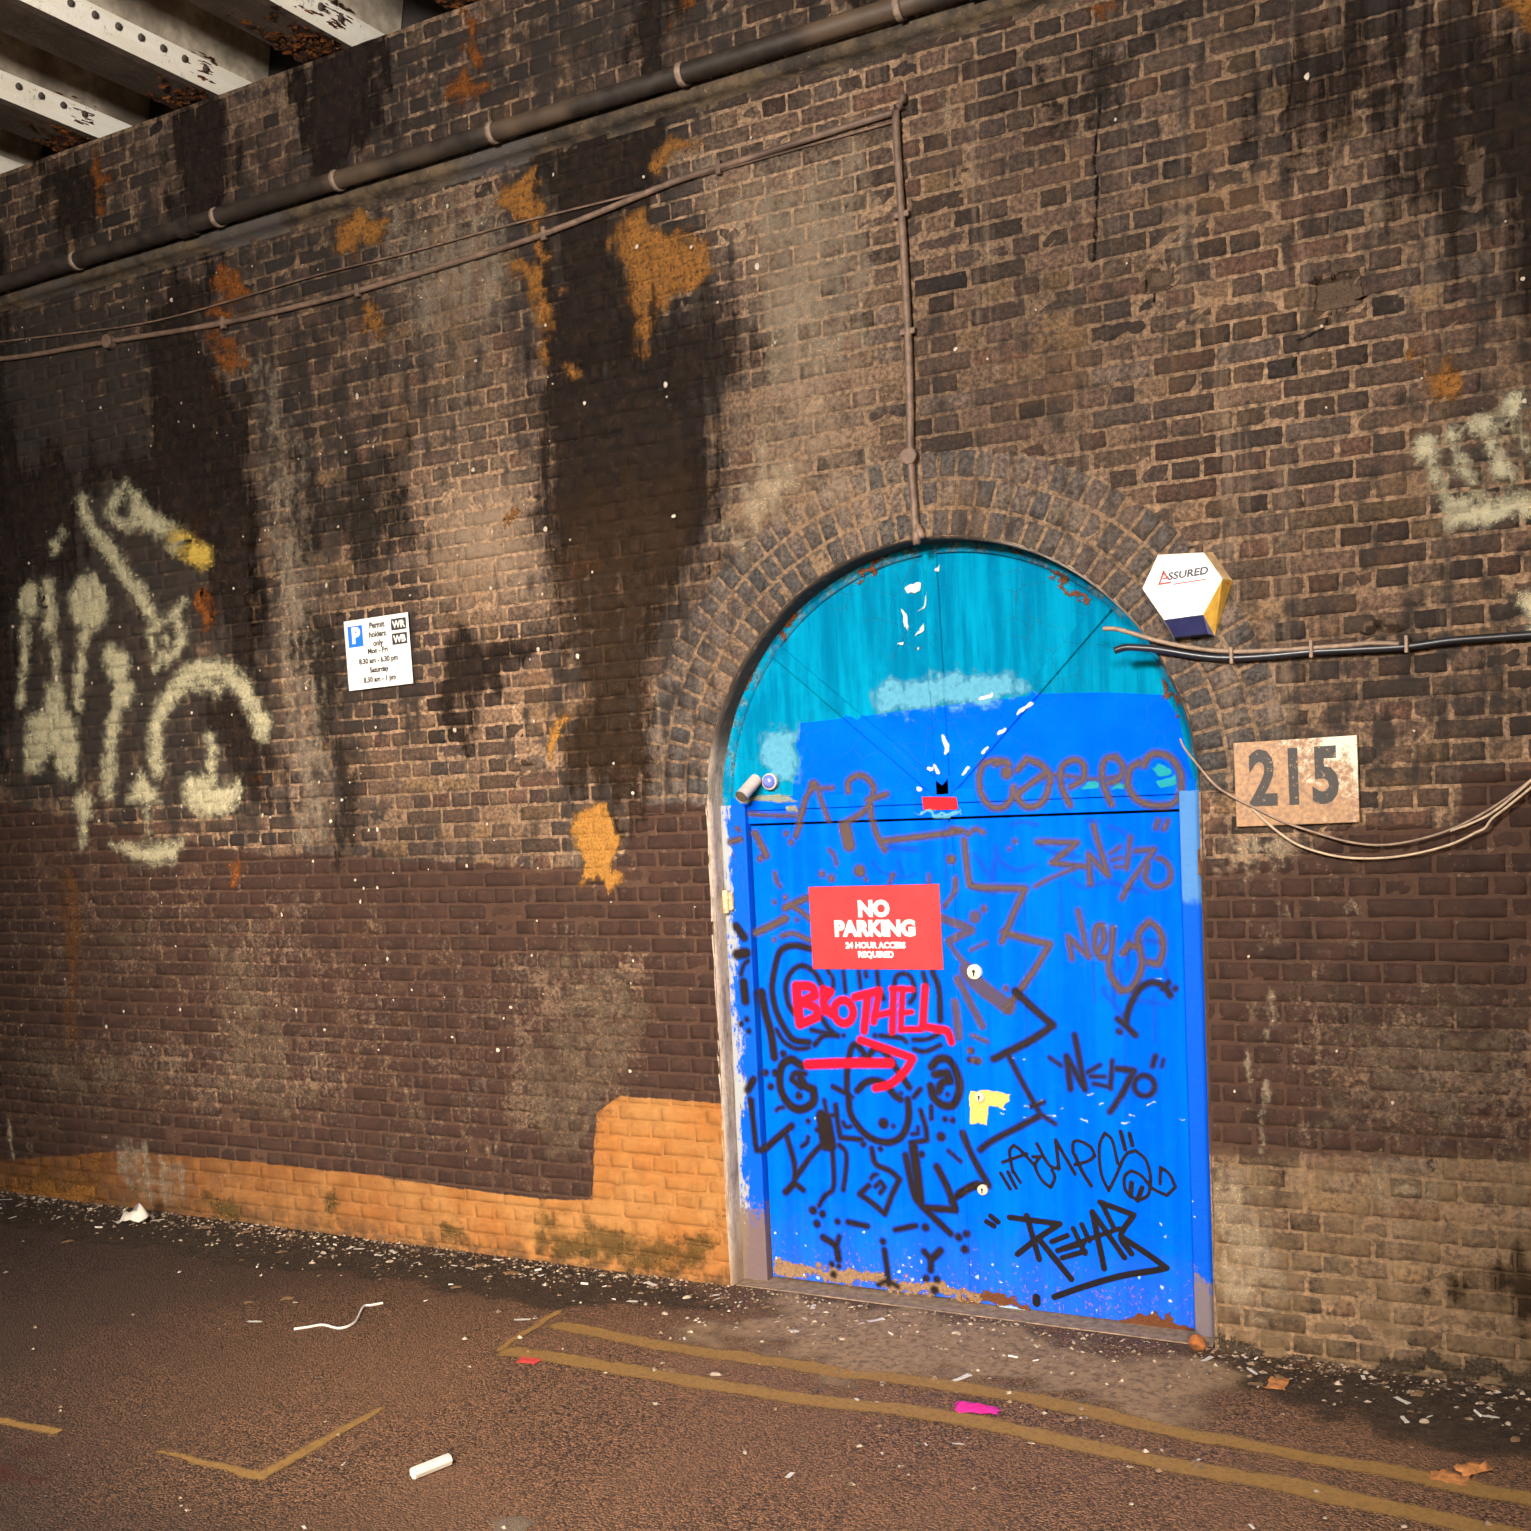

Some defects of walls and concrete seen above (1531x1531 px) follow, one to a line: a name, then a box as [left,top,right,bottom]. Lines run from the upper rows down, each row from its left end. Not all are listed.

corrosion [1484,0,1531,33]
corrosion [332,207,390,264]
damp [273,431,416,589]
damp [529,117,799,830]
damp [441,622,533,756]
damp [1212,1170,1290,1322]
damp [1494,1246,1531,1321]